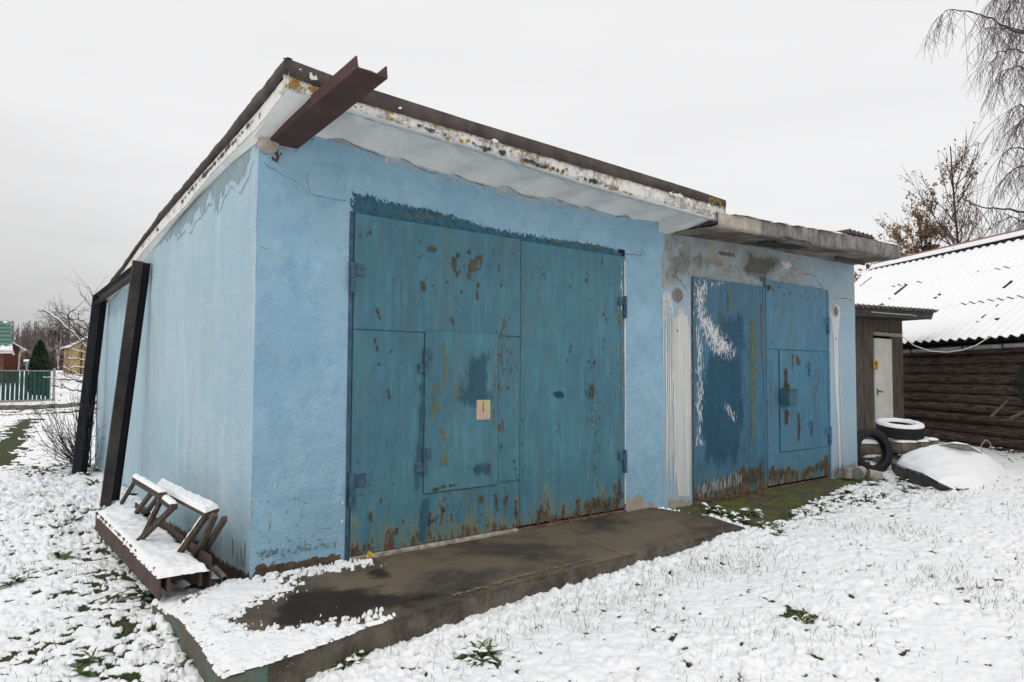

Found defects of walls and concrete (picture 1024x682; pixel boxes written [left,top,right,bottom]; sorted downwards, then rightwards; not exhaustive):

damp [155,143,257,244]
crack [266,164,347,201]
peeling [447,249,494,300]
damp [673,251,735,278]
damp [702,230,809,282]
corrosion [695,455,830,500]
corrosion [427,483,459,528]
corrosion [478,493,518,528]
corrosion [536,476,624,525]